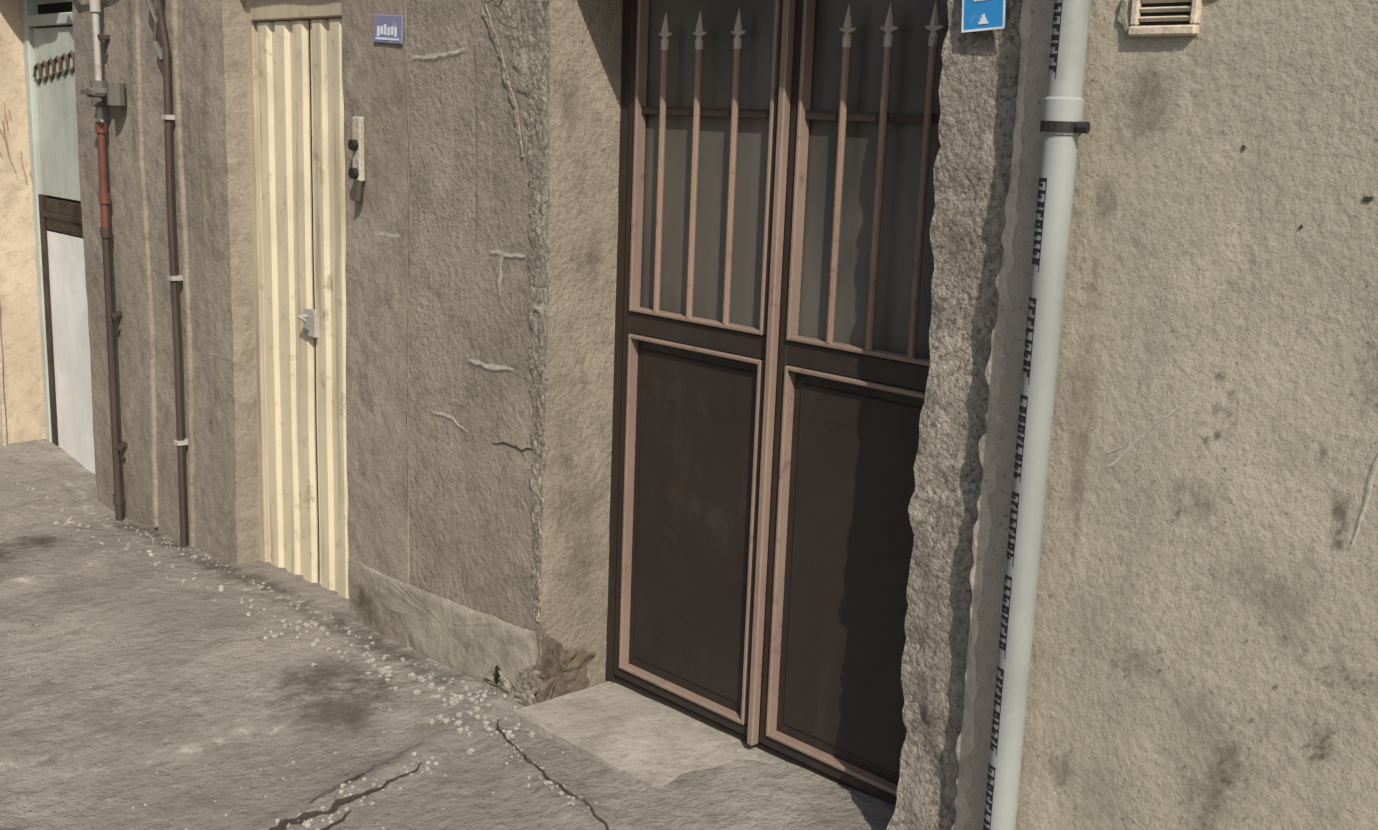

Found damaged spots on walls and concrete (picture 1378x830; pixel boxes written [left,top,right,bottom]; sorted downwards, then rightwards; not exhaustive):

spalling [475,0,597,707]